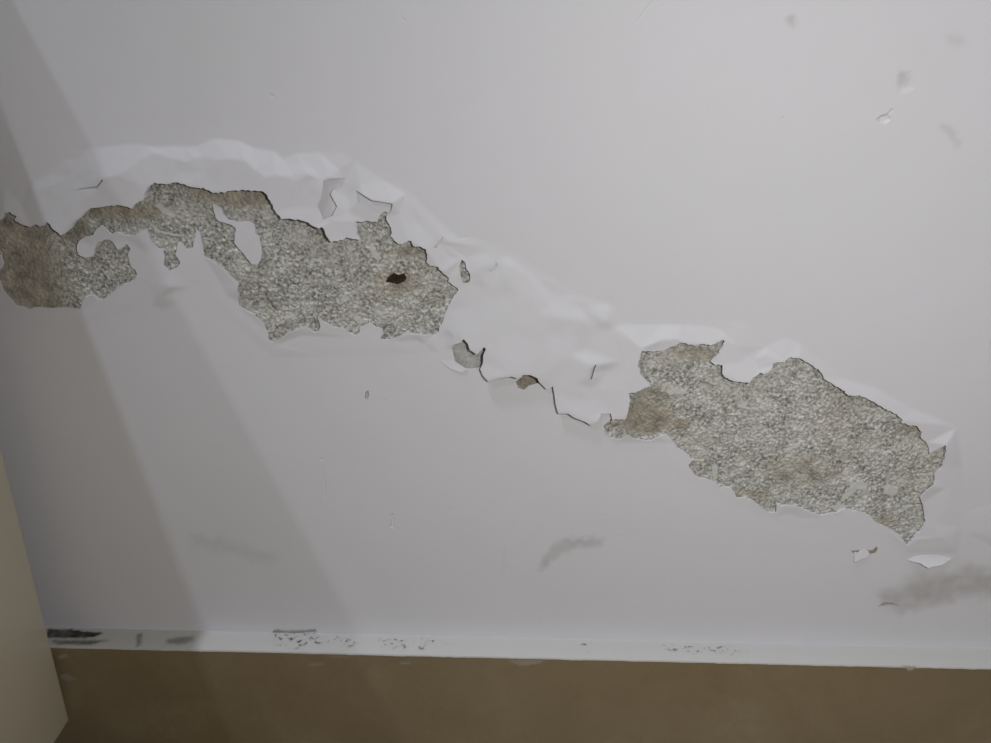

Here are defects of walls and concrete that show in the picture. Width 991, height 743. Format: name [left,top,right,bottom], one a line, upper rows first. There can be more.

peeling [0,127,470,358]
peeling [604,315,965,568]